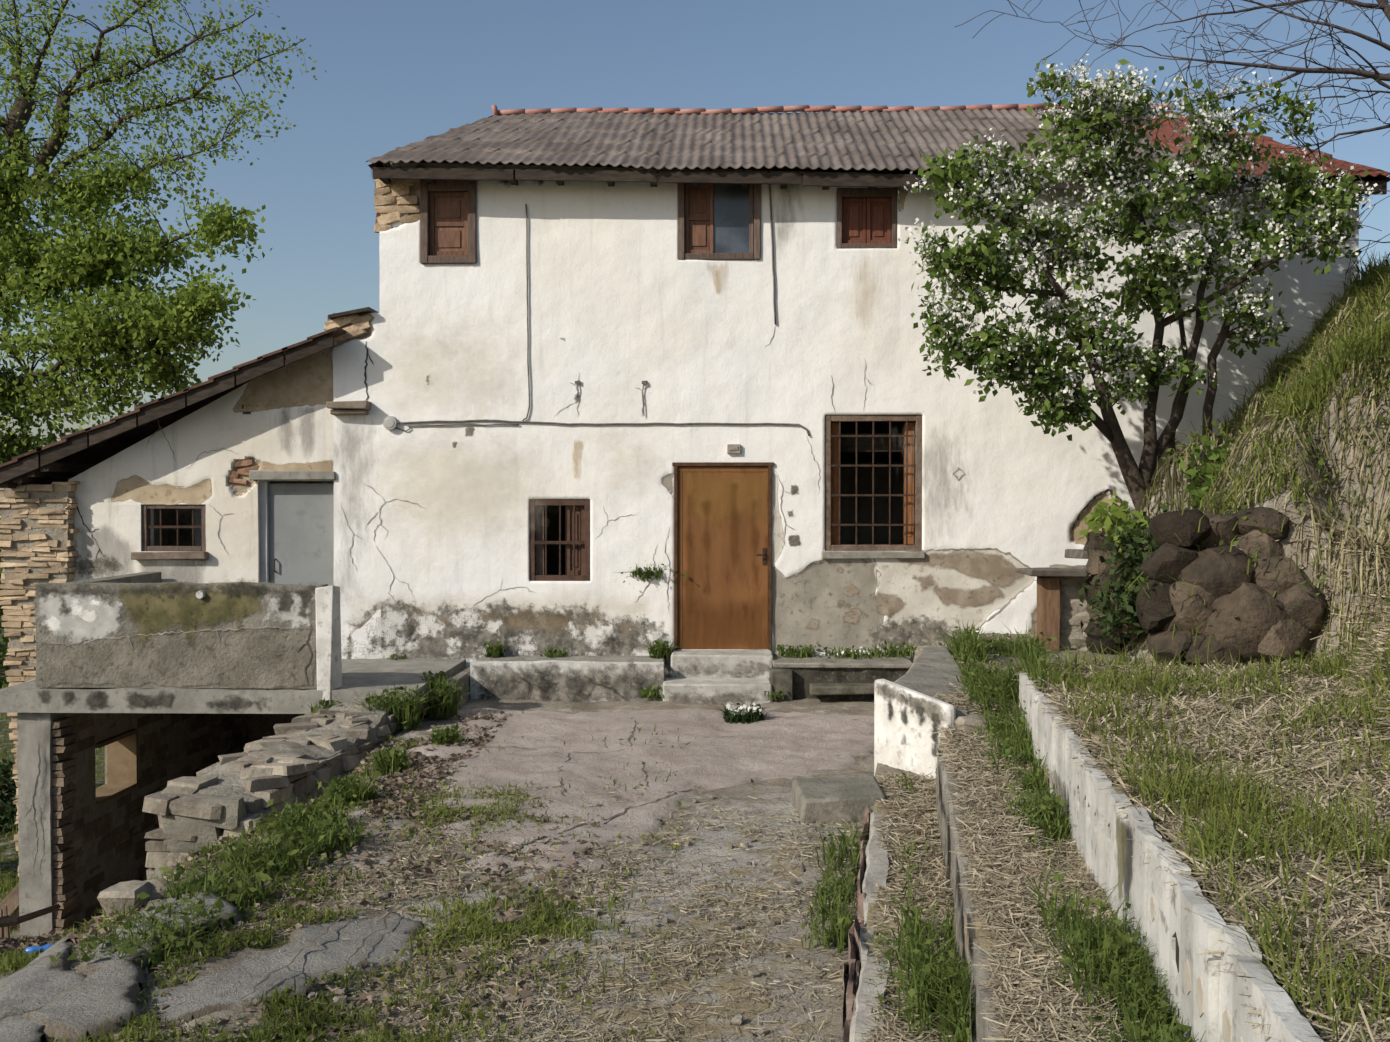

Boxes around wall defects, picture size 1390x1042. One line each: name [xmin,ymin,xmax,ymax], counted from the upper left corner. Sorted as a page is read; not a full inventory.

flaking render [373,179,420,233]
flaking render [233,313,374,414]
flaking render [111,475,212,505]
flaking render [228,457,332,496]
water stain [39,528,315,618]
crack [342,483,423,606]
flaking render [772,474,1034,655]
water stain [344,598,772,704]